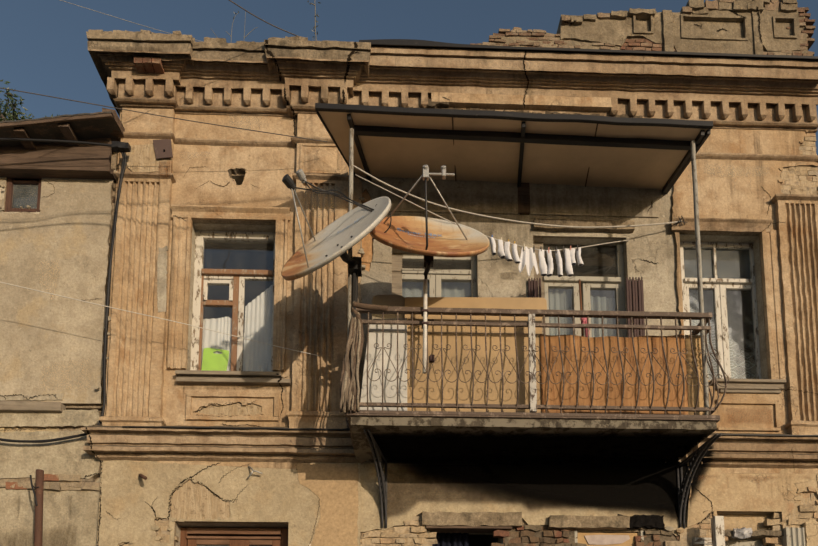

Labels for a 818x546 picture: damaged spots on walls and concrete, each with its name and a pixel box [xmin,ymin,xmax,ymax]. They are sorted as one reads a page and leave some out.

crack [265,40,296,136]
crack [342,42,359,104]
crack [522,50,530,108]
spalling [558,39,663,51]
spalling [763,6,816,56]
hole [228,167,247,185]
spalling [778,130,818,195]
crack [0,393,56,401]
crack [193,401,261,427]
crack [145,463,246,521]
spalling [491,524,587,546]
spalling [762,486,818,546]